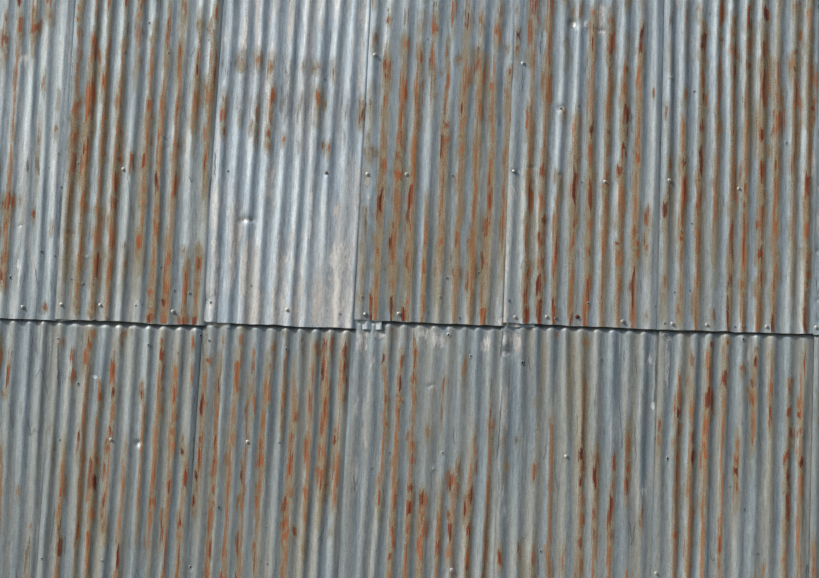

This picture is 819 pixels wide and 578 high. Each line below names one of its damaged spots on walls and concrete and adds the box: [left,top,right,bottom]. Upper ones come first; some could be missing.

rust [0,0,52,287]
rust [191,0,227,193]
rust [251,86,276,152]
rust [360,0,649,337]
rust [58,0,202,578]
rust [53,443,67,578]
rust [136,327,348,578]
rust [482,405,502,578]
rust [517,542,535,578]
rust [544,416,554,578]
rust [574,374,614,578]